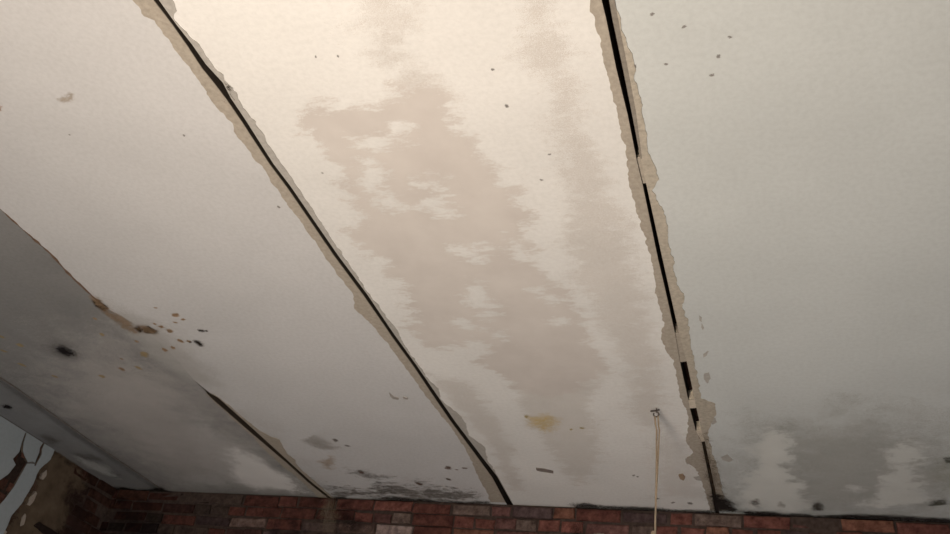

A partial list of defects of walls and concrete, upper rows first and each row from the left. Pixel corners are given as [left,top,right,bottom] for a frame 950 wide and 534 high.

rust [86,295,208,371]
peeling [4,450,122,534]
crack [0,377,161,495]
water stain [302,435,492,534]
water stain [572,388,950,523]